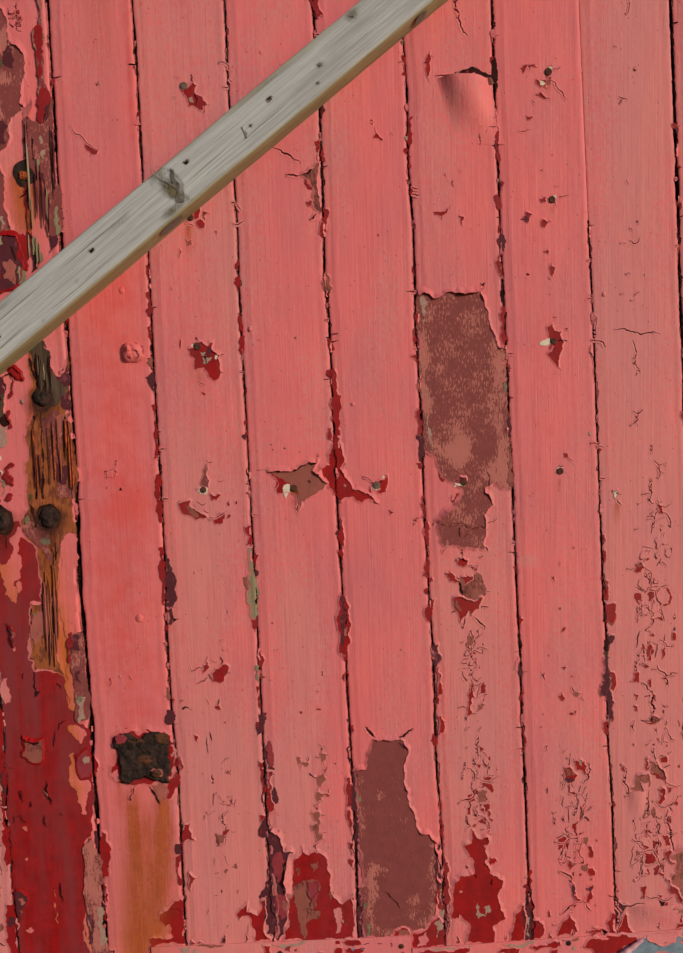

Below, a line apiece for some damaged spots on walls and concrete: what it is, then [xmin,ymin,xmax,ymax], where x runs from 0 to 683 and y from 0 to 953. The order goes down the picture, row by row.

rust [13,159,37,235]
rust [0,505,14,535]
peeling [177,459,237,525]
peeling [247,368,395,516]
peeling [410,286,513,629]
crack [629,408,673,662]
peeling [0,338,182,953]
peeling [630,614,683,735]
peeling [144,871,204,953]
peeling [220,734,683,953]
crack [435,735,500,826]
crack [523,713,678,881]